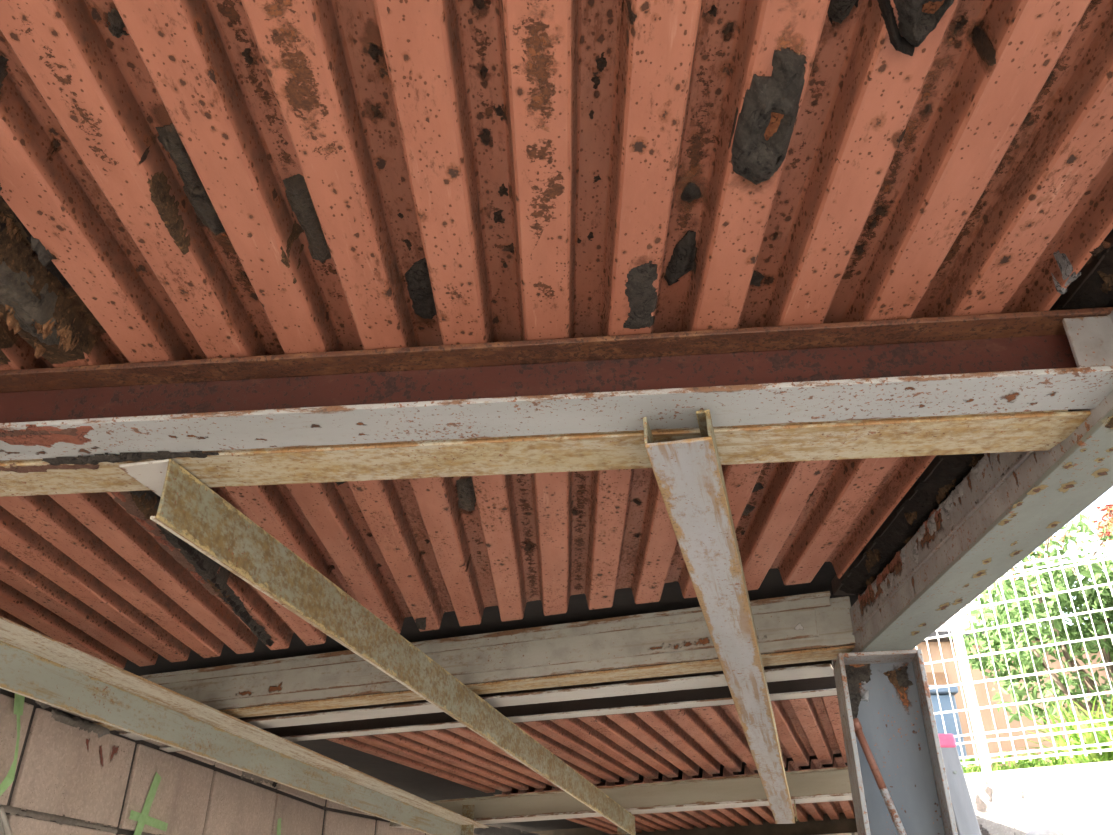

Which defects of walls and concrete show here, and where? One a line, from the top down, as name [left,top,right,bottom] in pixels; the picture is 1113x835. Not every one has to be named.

rust [217,0,337,284]
rust [512,0,565,255]
rust [937,0,1101,276]
rust [486,180,516,268]
rust [534,282,555,302]
rust [1056,242,1113,310]
peeling [0,424,100,473]
peeling [111,491,219,595]
peeling [858,452,1011,616]
rust [839,447,1113,612]
rust [843,663,913,719]